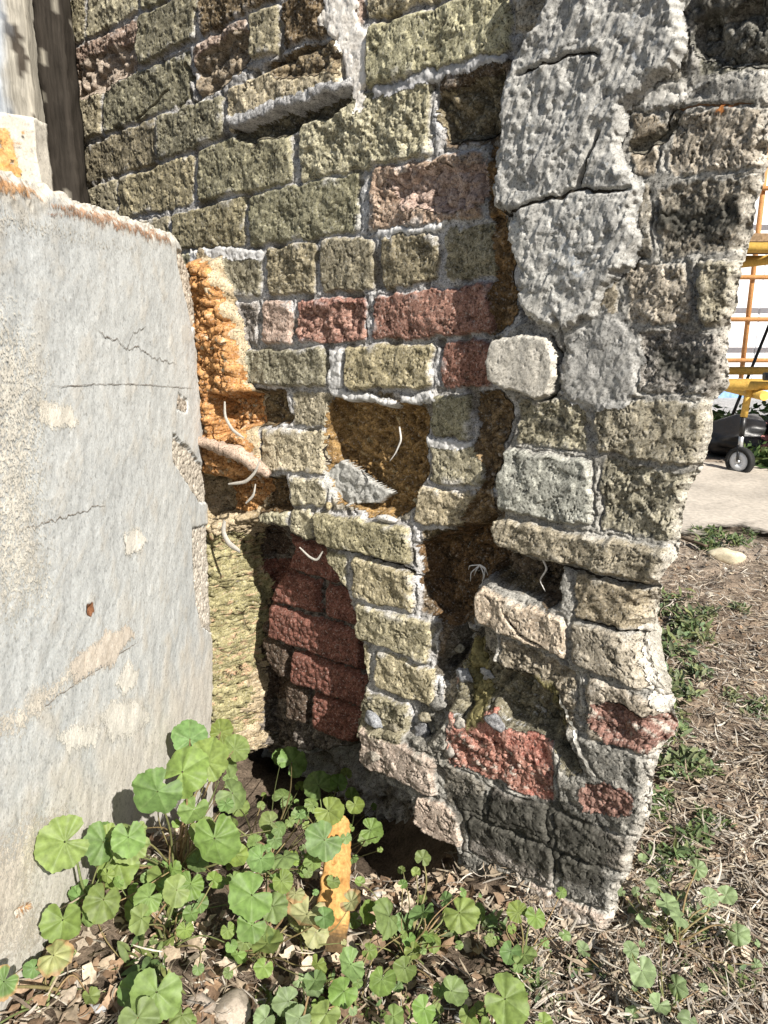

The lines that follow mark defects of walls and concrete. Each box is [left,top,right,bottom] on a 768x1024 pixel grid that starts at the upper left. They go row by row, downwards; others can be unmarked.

crack [520,52,599,75]
crack [499,133,631,217]
crack [47,328,187,388]
flaking render [224,401,244,439]
spalling [172,437,205,502]
flaking render [228,461,260,504]
spalling [323,397,431,523]
crack [20,505,104,534]
spalling [416,513,564,627]
spalling [192,476,369,751]